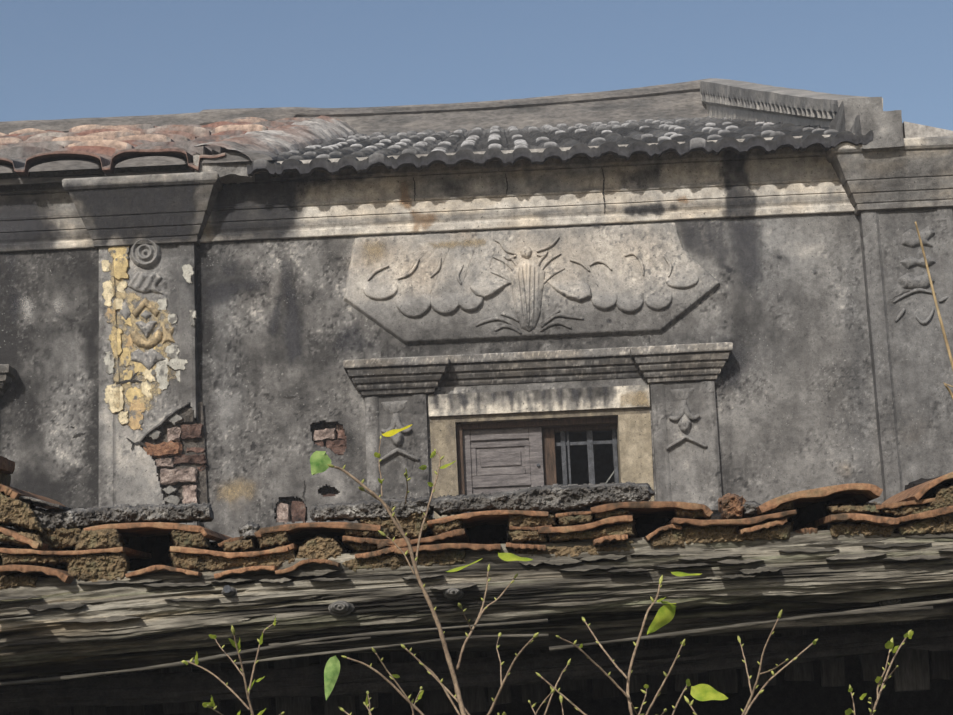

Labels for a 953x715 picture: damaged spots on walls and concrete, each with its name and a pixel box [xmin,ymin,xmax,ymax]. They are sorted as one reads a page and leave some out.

crack [599,168,607,214]
leakage [625,204,677,216]
leakage [684,150,760,285]
peeling [101,246,207,505]
spalling [311,422,347,455]
spalling [275,497,308,524]